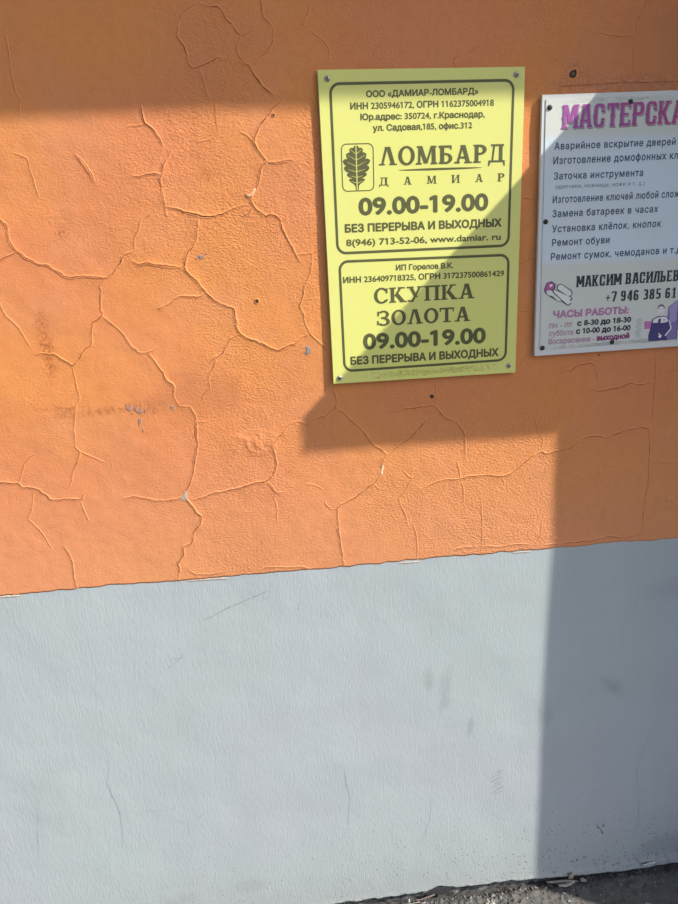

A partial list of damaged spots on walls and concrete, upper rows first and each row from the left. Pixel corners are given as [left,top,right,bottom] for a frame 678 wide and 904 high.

crack [0,0,678,589]